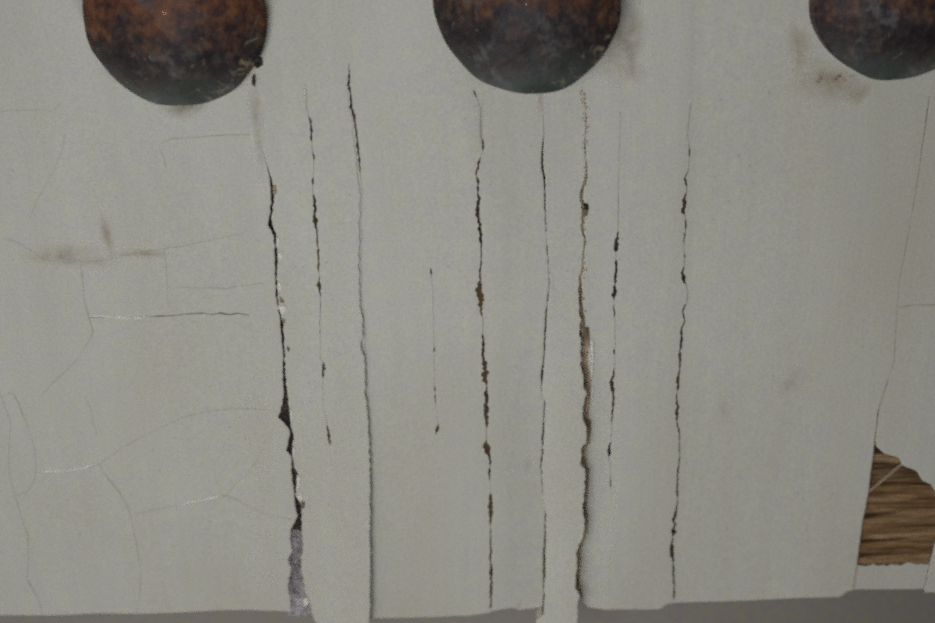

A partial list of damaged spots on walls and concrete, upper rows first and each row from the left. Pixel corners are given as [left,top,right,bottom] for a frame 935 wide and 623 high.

crack [304,88,321,312]
crack [347,70,362,186]
crack [539,128,547,222]
crack [0,176,313,617]
crack [473,90,493,608]
crack [607,348,615,487]
crack [611,231,619,321]
crack [670,98,691,599]
peeling [854,444,935,589]